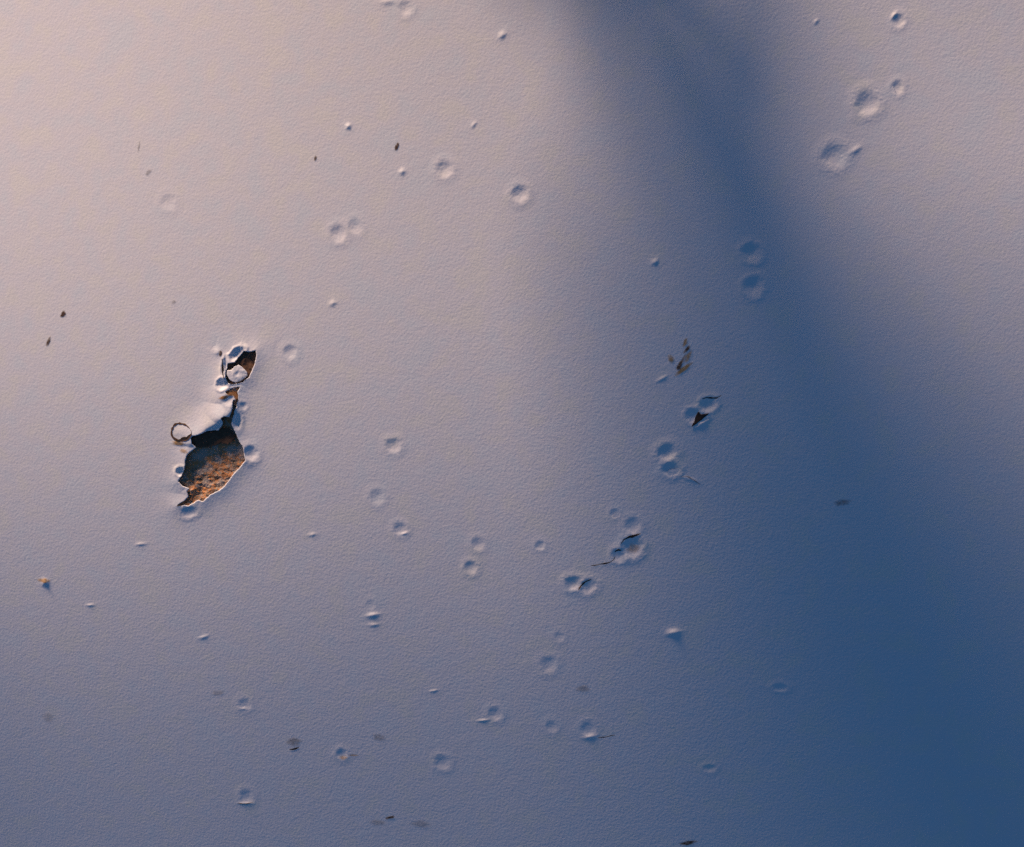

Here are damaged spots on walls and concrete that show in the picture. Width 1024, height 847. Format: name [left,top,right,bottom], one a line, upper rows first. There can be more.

peeling [148,318,286,537]
peeling [669,339,691,374]